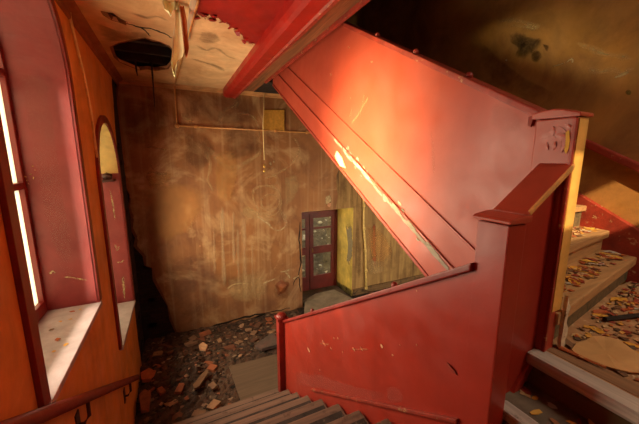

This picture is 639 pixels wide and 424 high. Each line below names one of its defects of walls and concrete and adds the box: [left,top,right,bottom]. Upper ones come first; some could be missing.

crack [126,23,171,38]
peeling [162,0,287,78]
damp [512,35,548,61]
peeling [334,138,449,270]